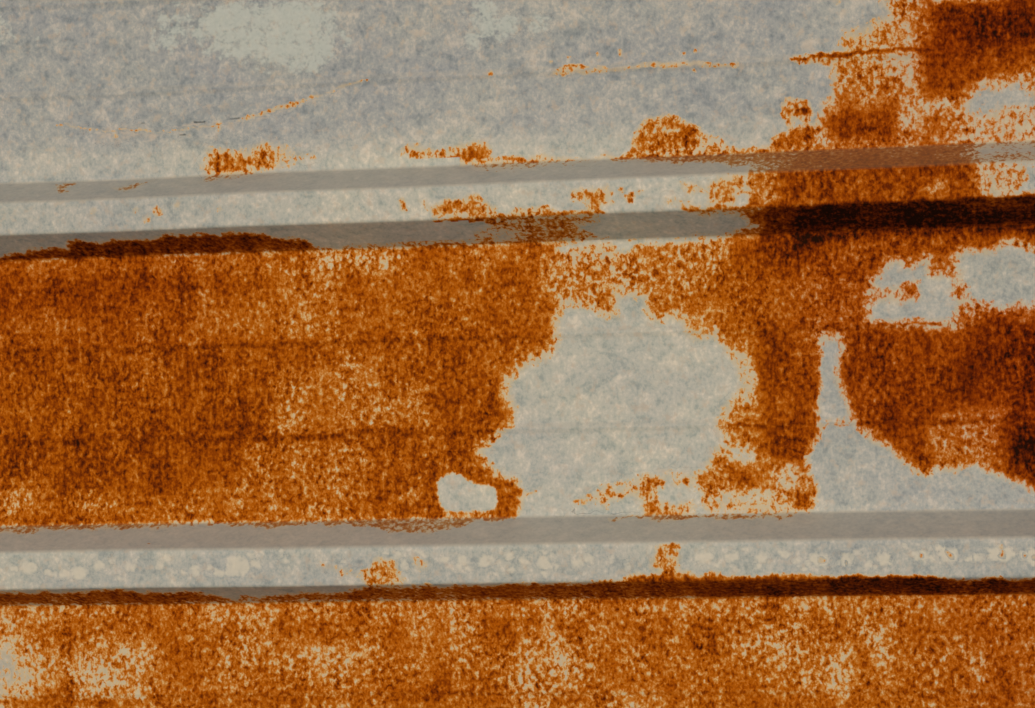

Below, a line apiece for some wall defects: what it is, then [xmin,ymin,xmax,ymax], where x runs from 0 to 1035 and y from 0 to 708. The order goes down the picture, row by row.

rust [0,0,1035,544]
rust [0,540,1035,708]